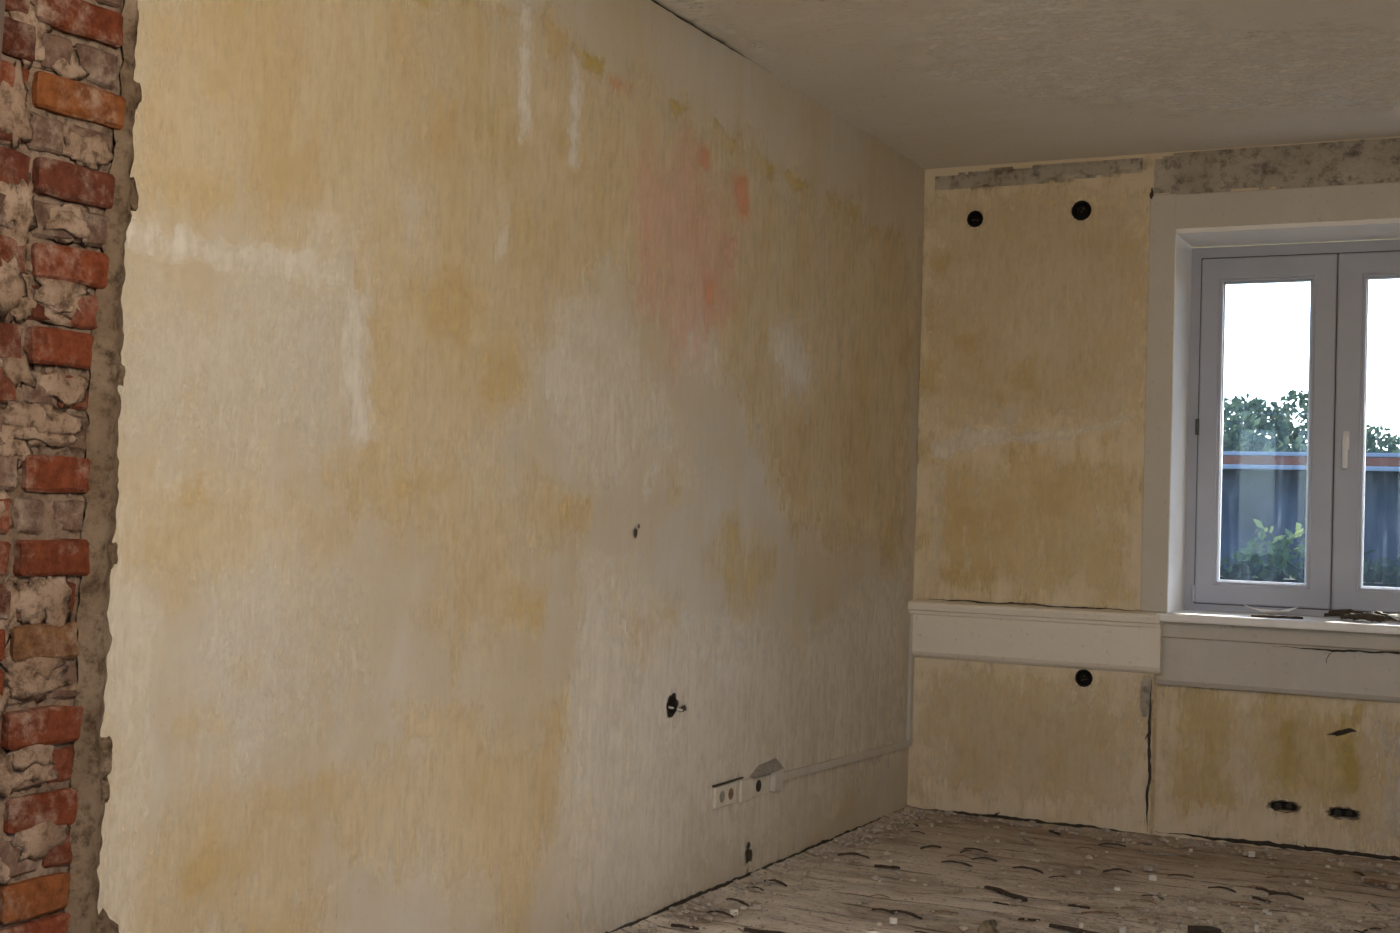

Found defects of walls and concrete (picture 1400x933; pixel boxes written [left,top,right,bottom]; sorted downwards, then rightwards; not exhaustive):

peeling [919,137,1400,449]
flaking render [0,0,142,933]
crack [1273,646,1400,664]